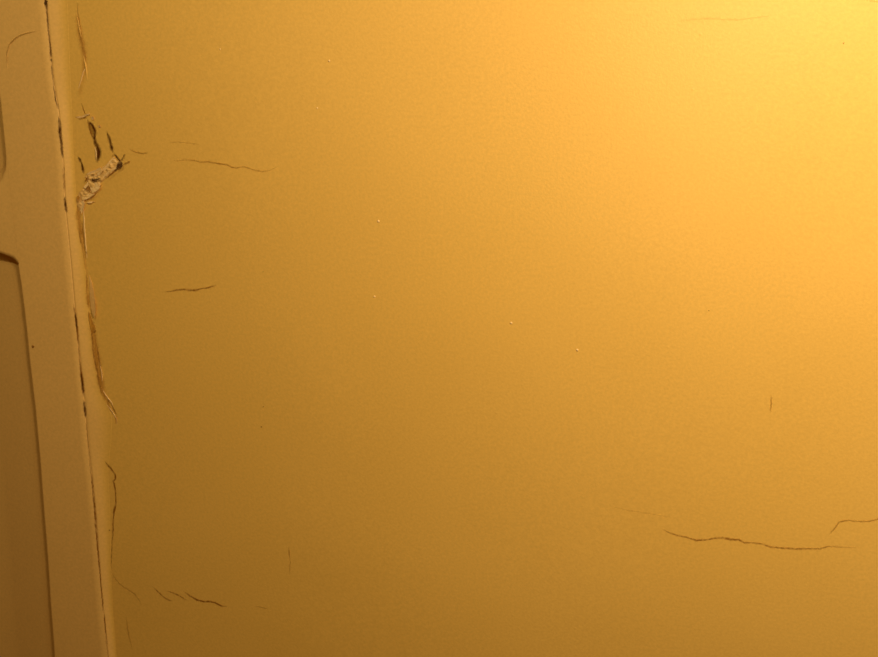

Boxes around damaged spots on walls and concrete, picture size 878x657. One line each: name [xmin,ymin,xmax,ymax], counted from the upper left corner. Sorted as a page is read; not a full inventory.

spalling [76,154,130,214]